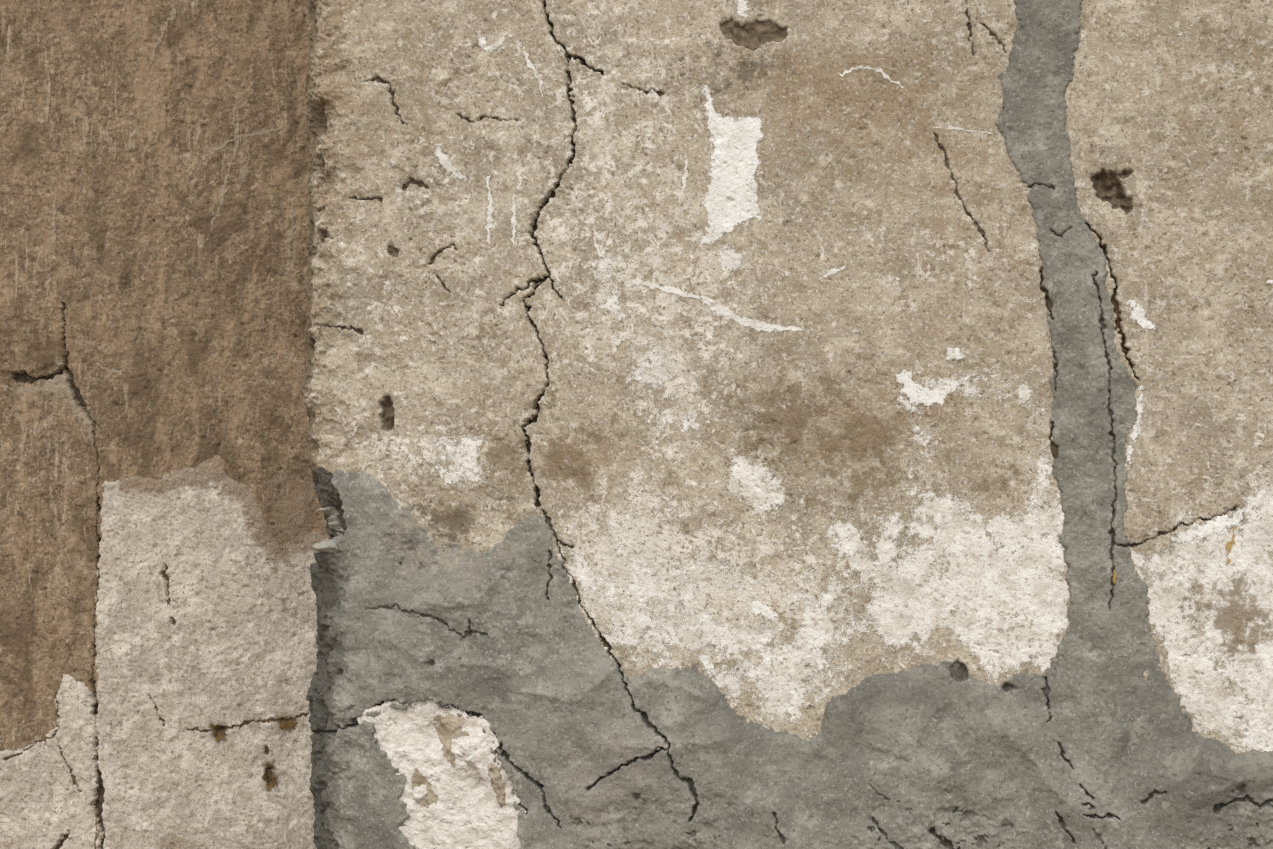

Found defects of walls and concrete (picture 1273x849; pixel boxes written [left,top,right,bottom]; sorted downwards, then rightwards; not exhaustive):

spalling [720,18,788,51]
crack [935,135,990,252]
crack [502,0,664,615]
crack [1040,268,1054,320]
crack [1049,422,1058,459]
crack [1092,273,1236,608]
crack [3,304,106,849]
crack [150,697,561,828]
spalling [357,699,527,849]
crack [587,666,699,821]
crack [869,797,903,849]
crack [1042,677,1167,849]